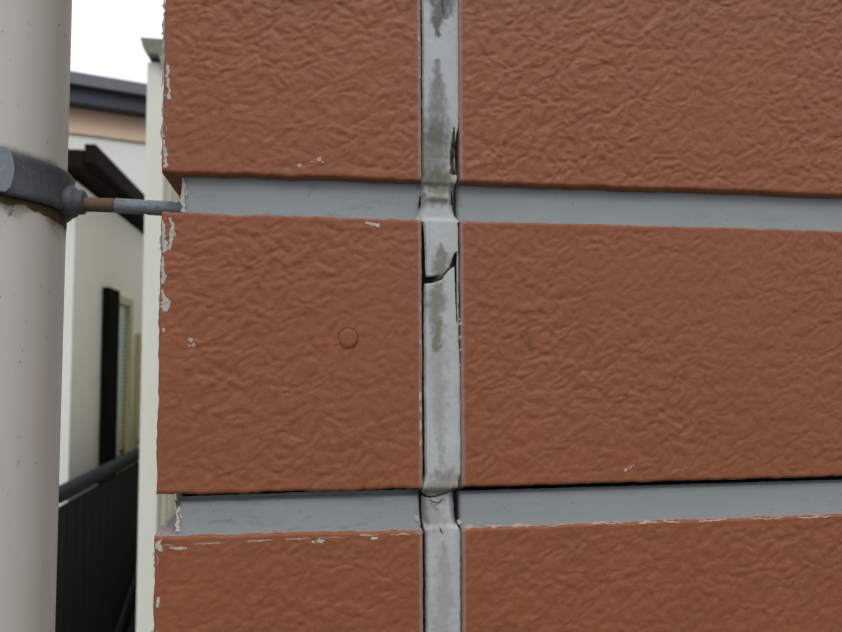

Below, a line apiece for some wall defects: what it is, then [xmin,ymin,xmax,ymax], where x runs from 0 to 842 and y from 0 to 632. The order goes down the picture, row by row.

water stain [430,0,451,37]
peeling [160,0,171,168]
peeling [180,177,188,212]
peeling [158,217,176,312]
crack [418,0,457,632]
peeling [175,500,183,532]
peeling [153,540,187,567]